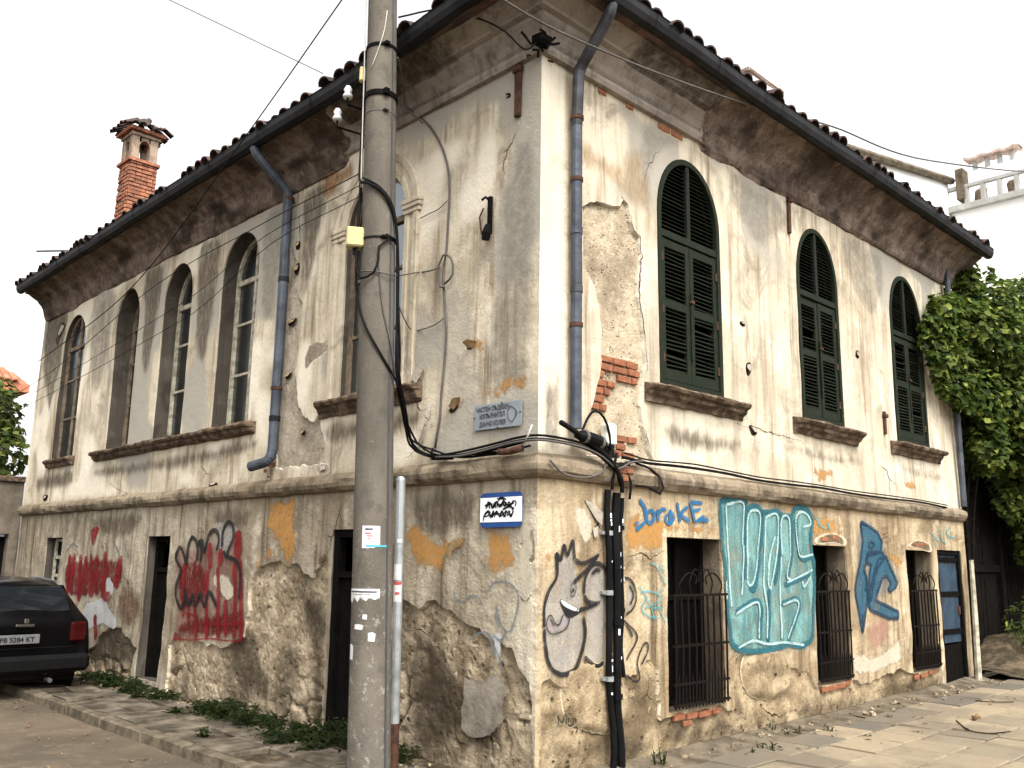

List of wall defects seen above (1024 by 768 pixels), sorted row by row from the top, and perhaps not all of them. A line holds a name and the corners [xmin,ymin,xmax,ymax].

water stain [303,187,326,280]
water stain [143,270,161,368]
water stain [197,240,219,356]
flaking render [263,241,329,478]
flaking render [582,200,654,482]
water stain [671,430,719,447]
flaking render [83,627,137,682]
flaking render [165,554,329,732]
flaking render [392,598,611,768]
flaking render [621,641,944,760]